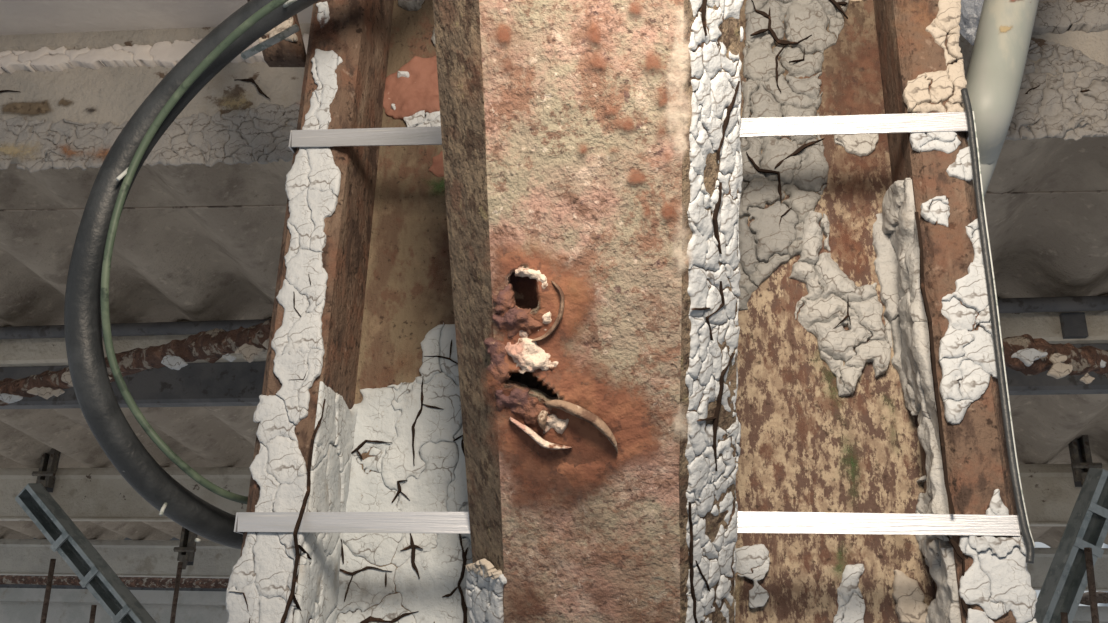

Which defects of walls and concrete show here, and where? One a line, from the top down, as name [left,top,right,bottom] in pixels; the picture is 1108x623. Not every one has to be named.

crack [712,81,824,254]
corrosion [832,47,884,115]
corrosion [105,320,271,383]
peeling [143,16,469,512]
corrosion [484,244,658,502]
crack [692,281,735,471]
peeling [685,0,998,623]
corrosion [1002,334,1108,384]
crack [280,399,326,623]
peeling [226,532,507,623]
crack [339,533,435,623]
peeling [892,535,1037,623]